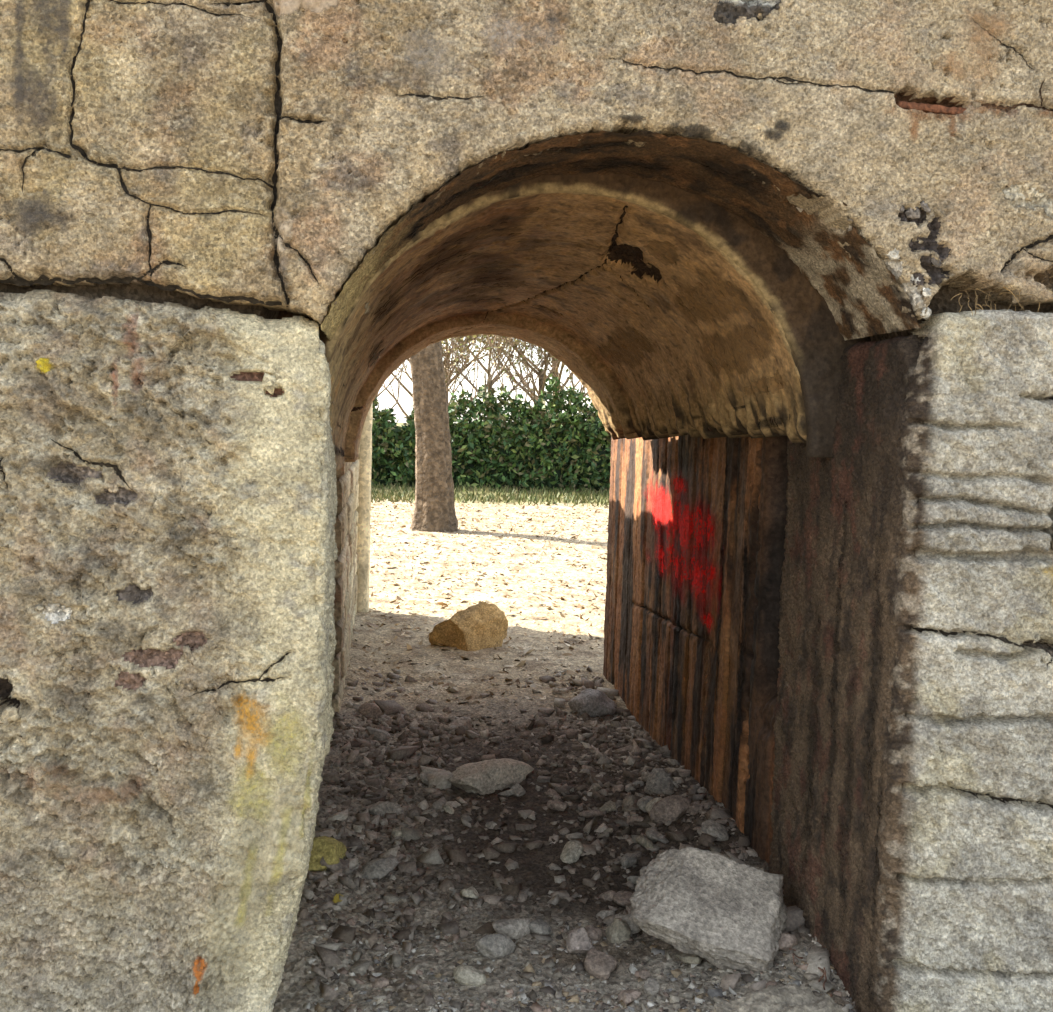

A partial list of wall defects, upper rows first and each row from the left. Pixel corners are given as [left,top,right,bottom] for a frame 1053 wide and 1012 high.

spalling [714,0,782,25]
crack [0,0,323,307]
crack [523,205,651,325]
spalling [882,201,1020,320]
crack [1000,235,1053,272]
spalling [0,672,21,724]
crack [188,652,291,697]
rust [235,697,264,767]